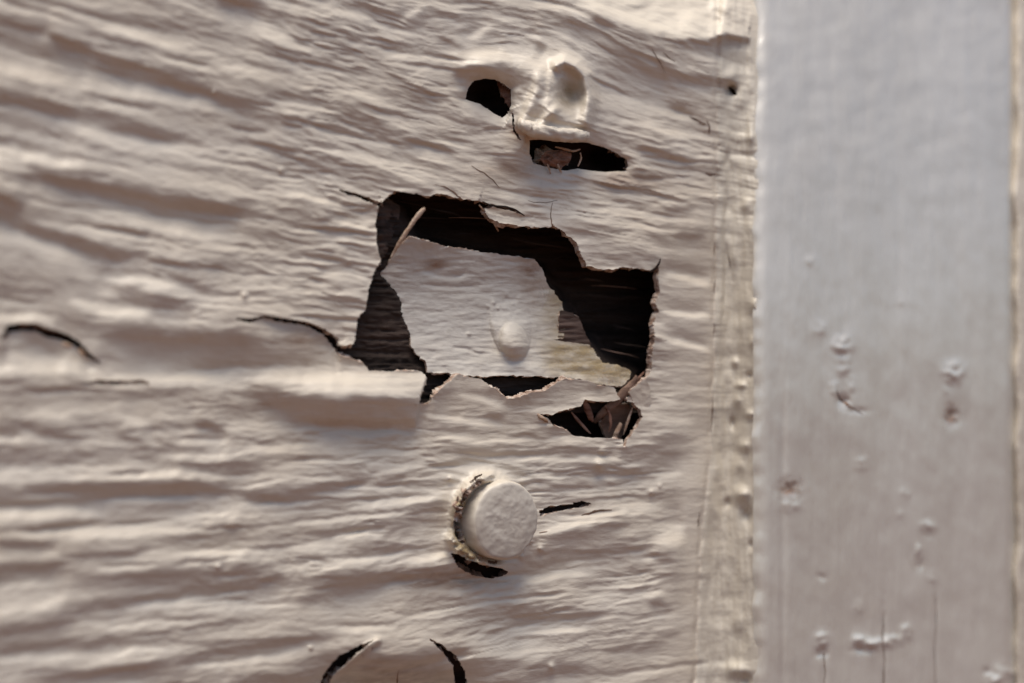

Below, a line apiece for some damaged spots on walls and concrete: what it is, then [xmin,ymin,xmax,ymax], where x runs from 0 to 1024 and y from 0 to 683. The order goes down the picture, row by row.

spalling [466,79,517,136]
spalling [529,140,626,172]
crack [1,322,149,386]
crack [236,316,342,352]
peeling [334,189,661,443]
crack [539,501,610,533]
crack [321,641,376,683]
crack [430,639,467,683]